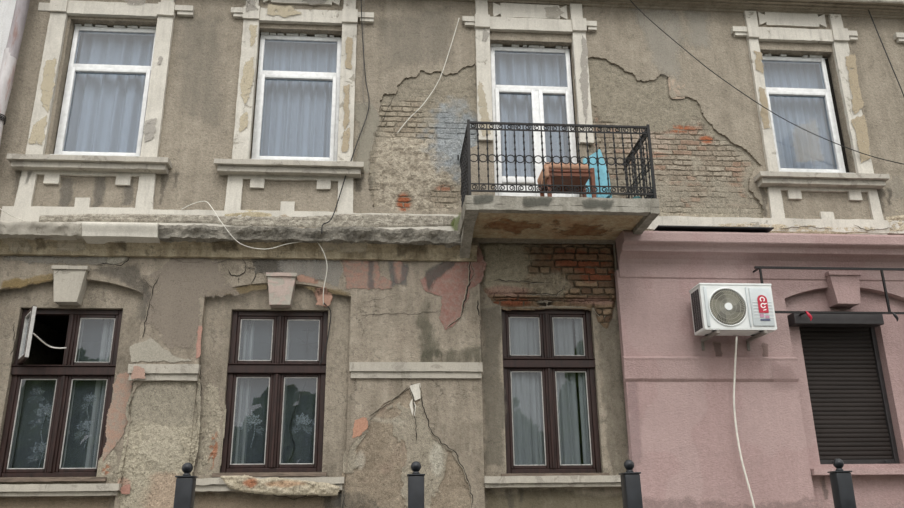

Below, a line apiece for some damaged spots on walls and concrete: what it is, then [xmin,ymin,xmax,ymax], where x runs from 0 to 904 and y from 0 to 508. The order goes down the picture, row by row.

peeling [28,58,57,145]
spalling [368,64,491,213]
spalling [579,34,876,234]
crack [142,258,256,338]
flaking render [420,243,616,330]
spalling [102,258,239,508]
crack [369,384,473,508]